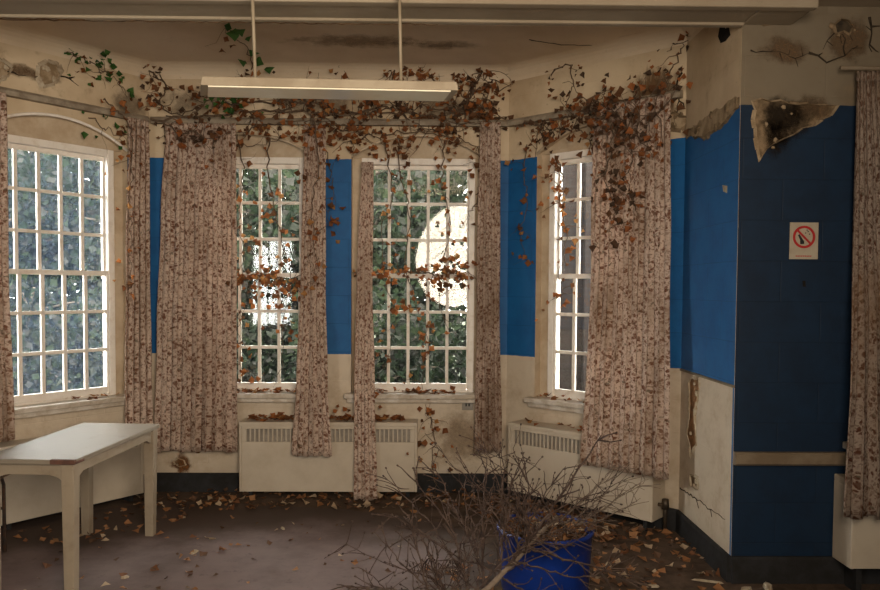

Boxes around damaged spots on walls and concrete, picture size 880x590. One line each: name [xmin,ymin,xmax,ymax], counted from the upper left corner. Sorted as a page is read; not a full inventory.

peeling [35,59,64,89]
peeling [671,96,740,141]
flaking render [751,97,840,162]